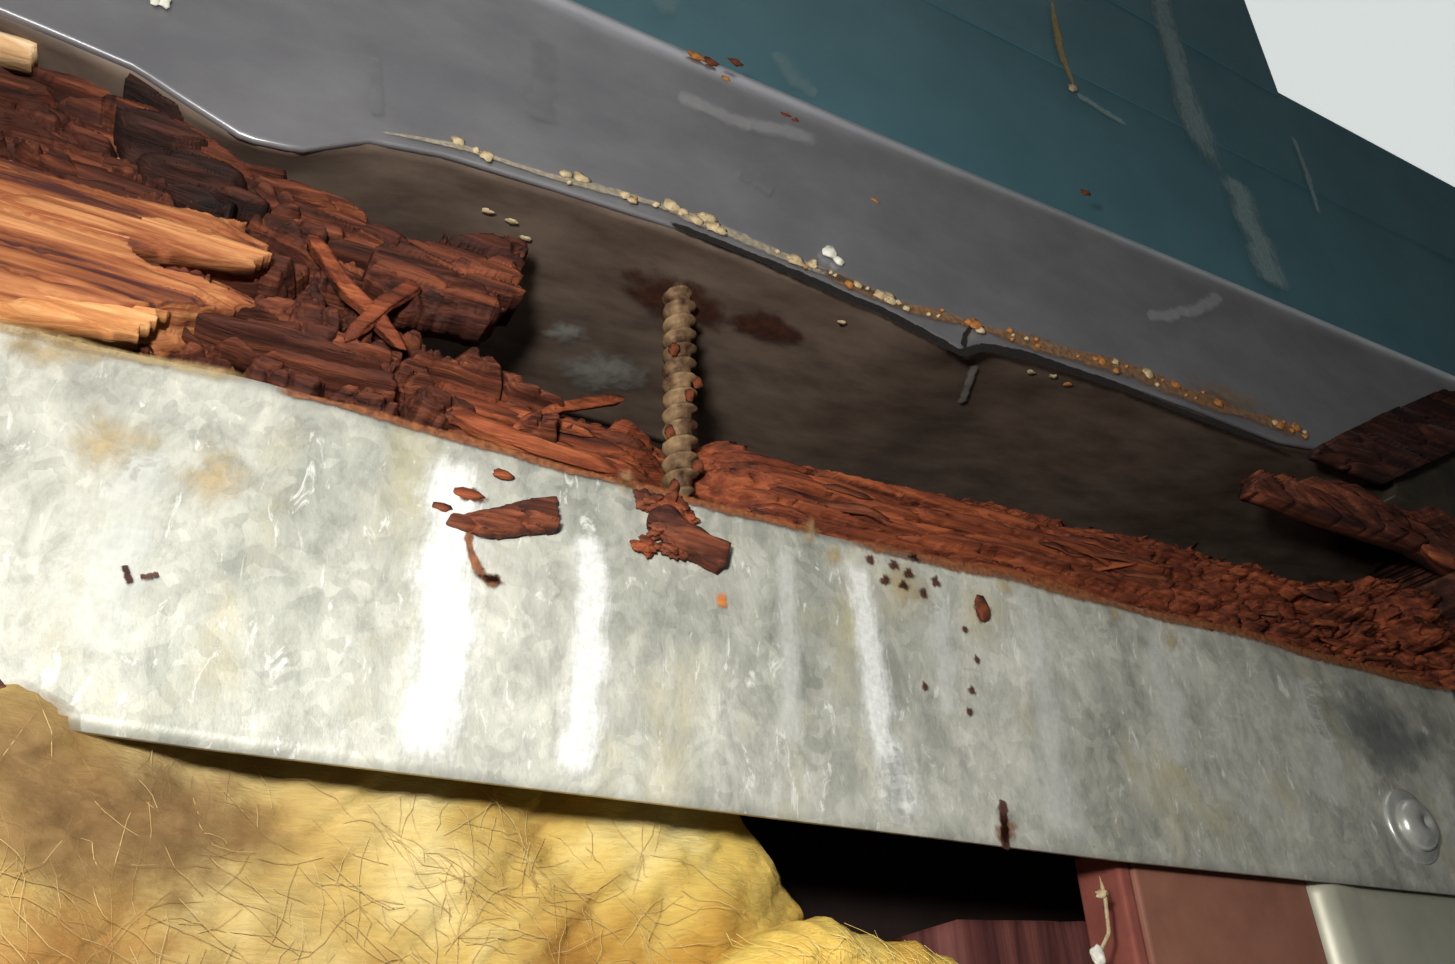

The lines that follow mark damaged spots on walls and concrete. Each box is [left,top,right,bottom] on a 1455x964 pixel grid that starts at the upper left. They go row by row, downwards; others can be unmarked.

rust [687,50,744,81]
rust [0,325,221,375]
rust [391,133,1309,439]
rust [282,389,812,533]
water stain [398,459,482,757]
rust [465,532,501,586]
water stain [556,537,609,772]
water stain [849,566,917,817]
rust [854,540,1448,691]
rust [997,799,1014,850]